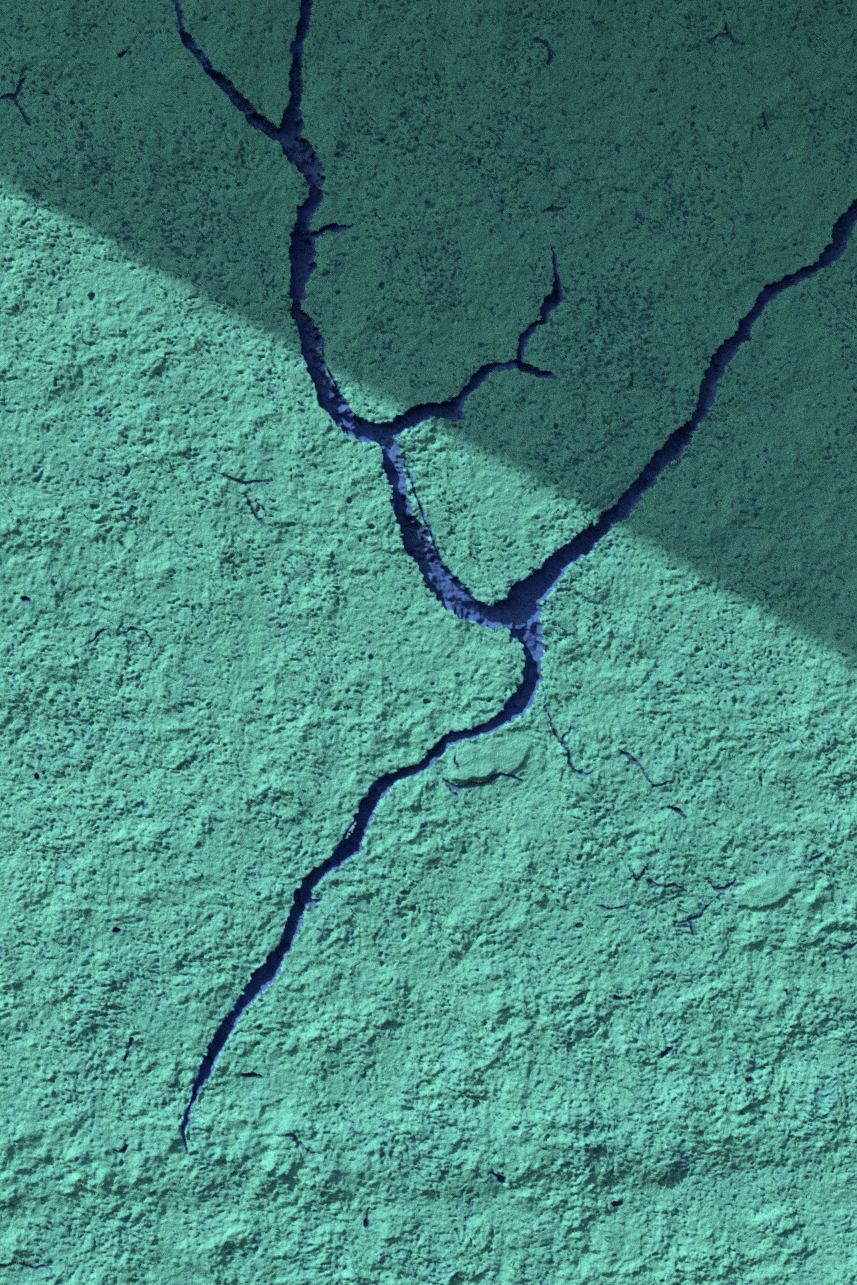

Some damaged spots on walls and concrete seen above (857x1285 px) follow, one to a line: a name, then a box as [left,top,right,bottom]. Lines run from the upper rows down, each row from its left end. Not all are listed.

crack [173,0,857,1154]